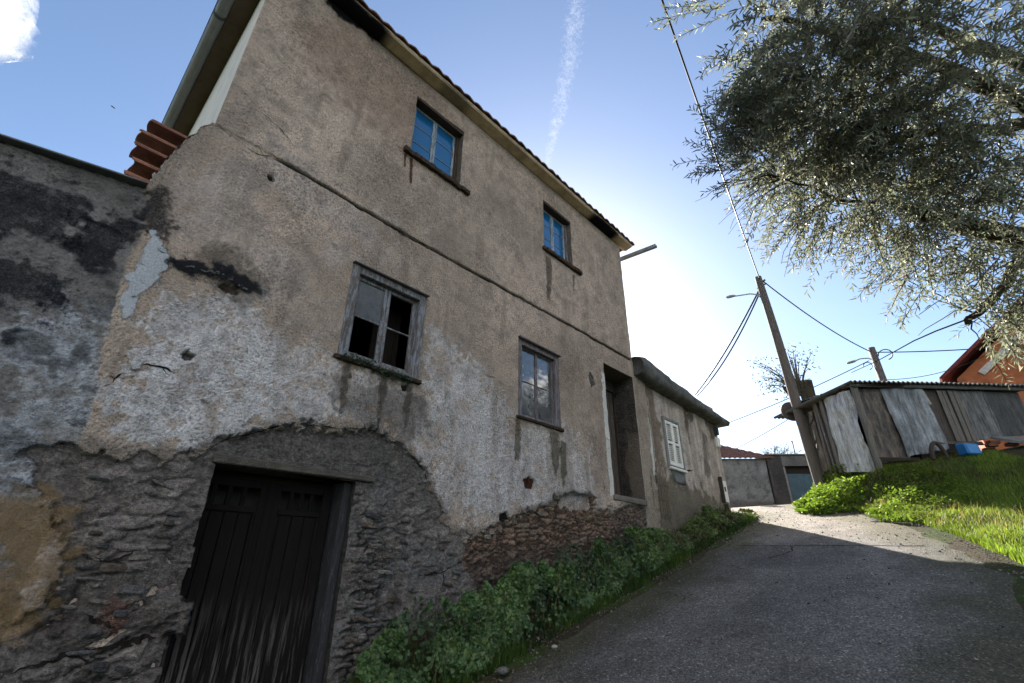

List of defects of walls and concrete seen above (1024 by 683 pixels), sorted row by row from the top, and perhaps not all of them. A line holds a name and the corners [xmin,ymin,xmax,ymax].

water stain [0,155,180,274]
crack [218,90,627,358]
water stain [2,328,21,345]
water stain [0,251,72,326]
crack [107,363,173,385]
water stain [550,432,567,486]
water stain [0,486,84,641]
flaking render [0,371,658,683]